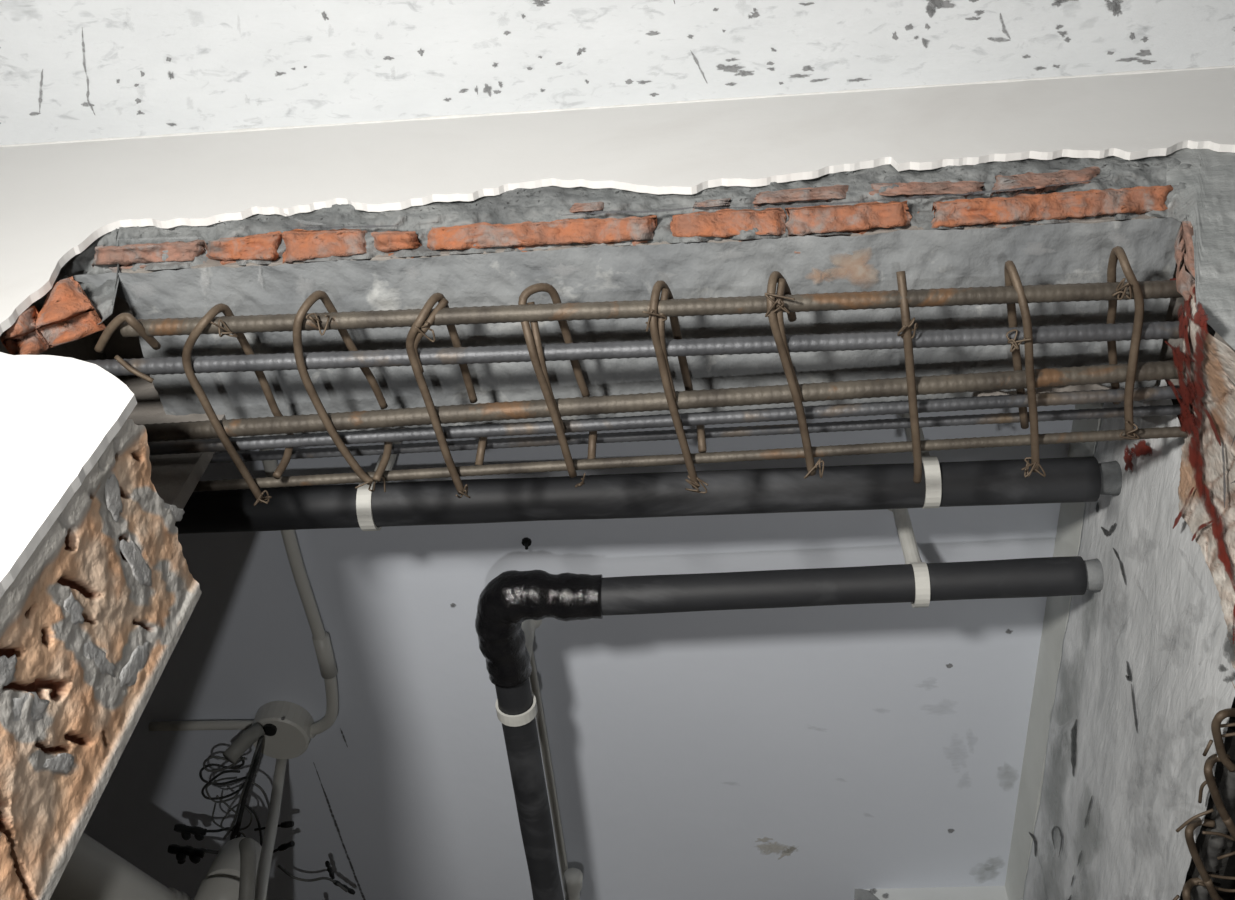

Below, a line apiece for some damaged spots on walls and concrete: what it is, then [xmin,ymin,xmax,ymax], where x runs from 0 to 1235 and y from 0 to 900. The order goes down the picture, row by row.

spalling [0,148,1235,631]
rust [1124,439,1152,471]
rust [1165,287,1235,644]
spalling [0,419,202,900]
spalling [1126,661,1137,731]
spalling [855,888,888,900]
spalling [1173,708,1235,900]